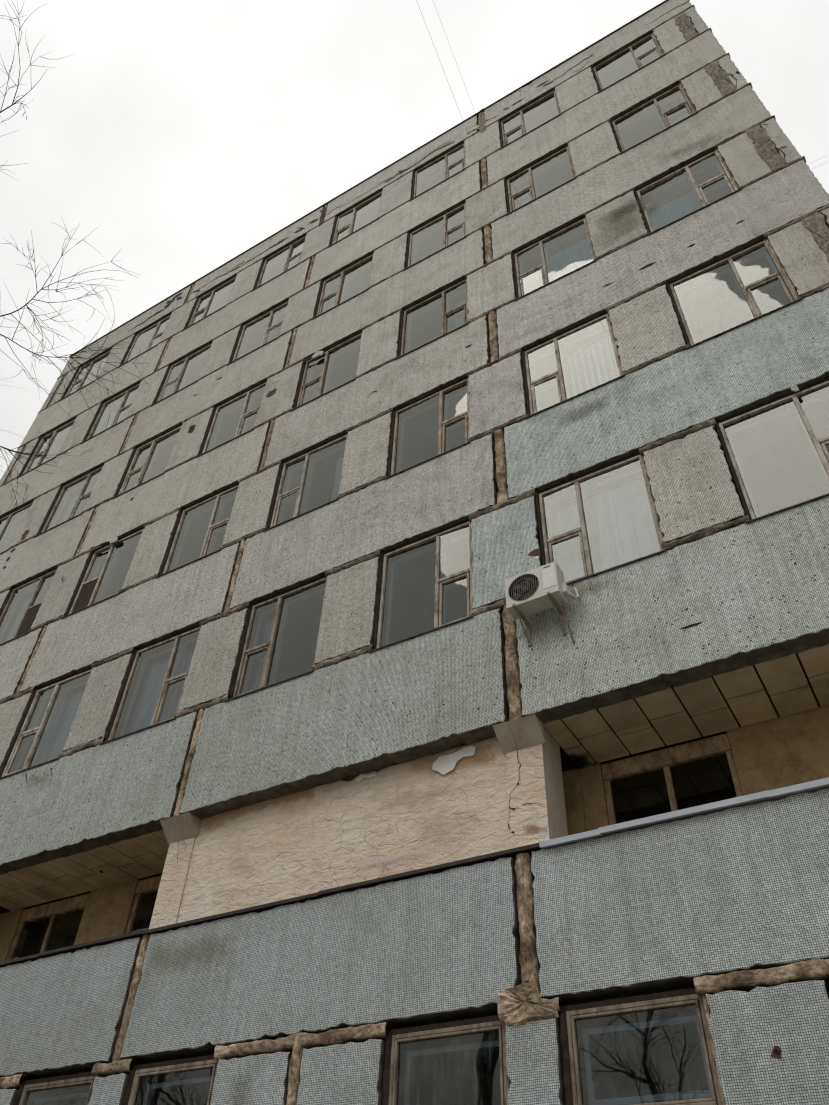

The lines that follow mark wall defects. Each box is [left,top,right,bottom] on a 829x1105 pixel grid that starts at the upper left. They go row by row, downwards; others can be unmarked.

spalling [703,60,747,97]
spalling [746,123,787,171]
peeling [432,746,476,775]
crack [508,749,544,833]